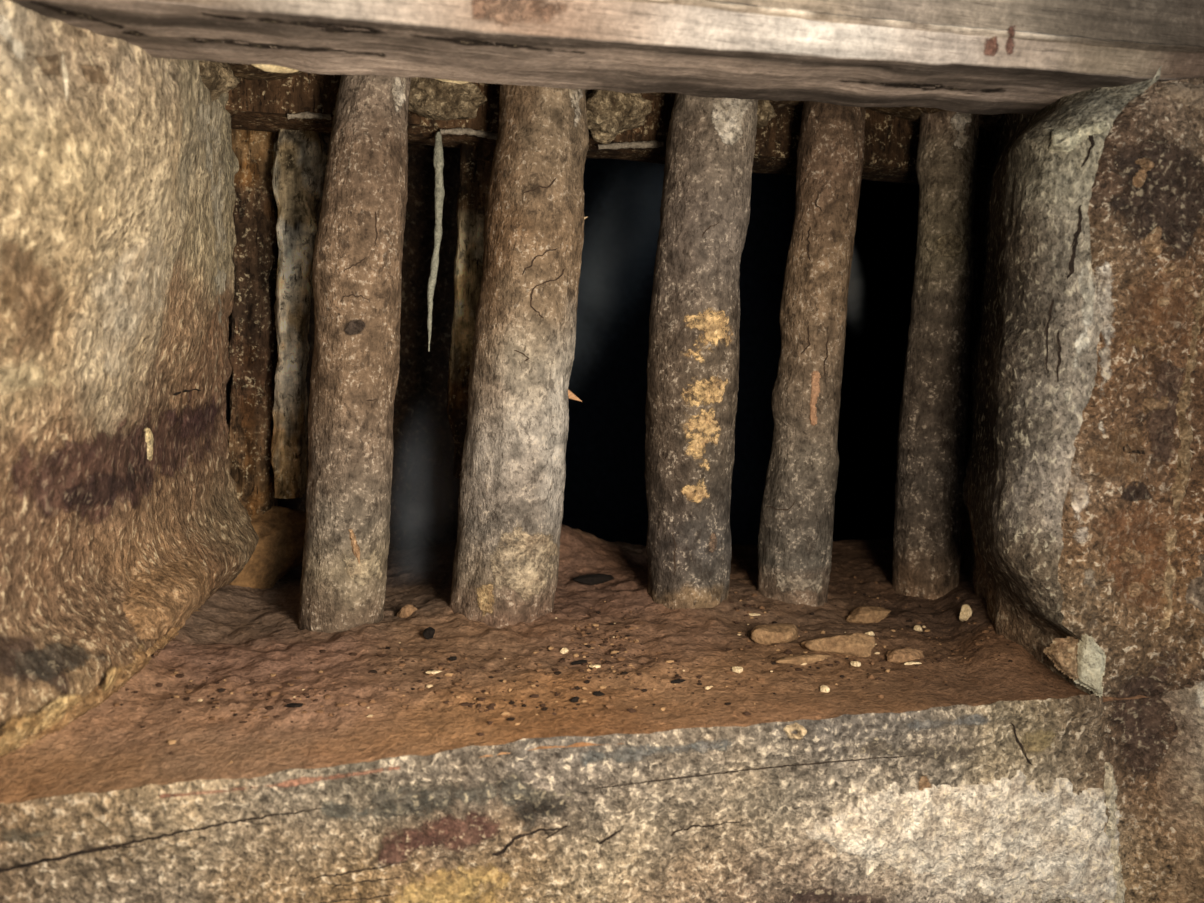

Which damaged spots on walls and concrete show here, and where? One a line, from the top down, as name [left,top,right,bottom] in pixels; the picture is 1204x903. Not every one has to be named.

water stain [10,391,222,524]
water stain [0,635,106,693]
crack [596,755,916,789]
crack [0,804,344,873]
crack [492,825,568,856]
crack [599,829,622,844]
crack [671,821,742,836]